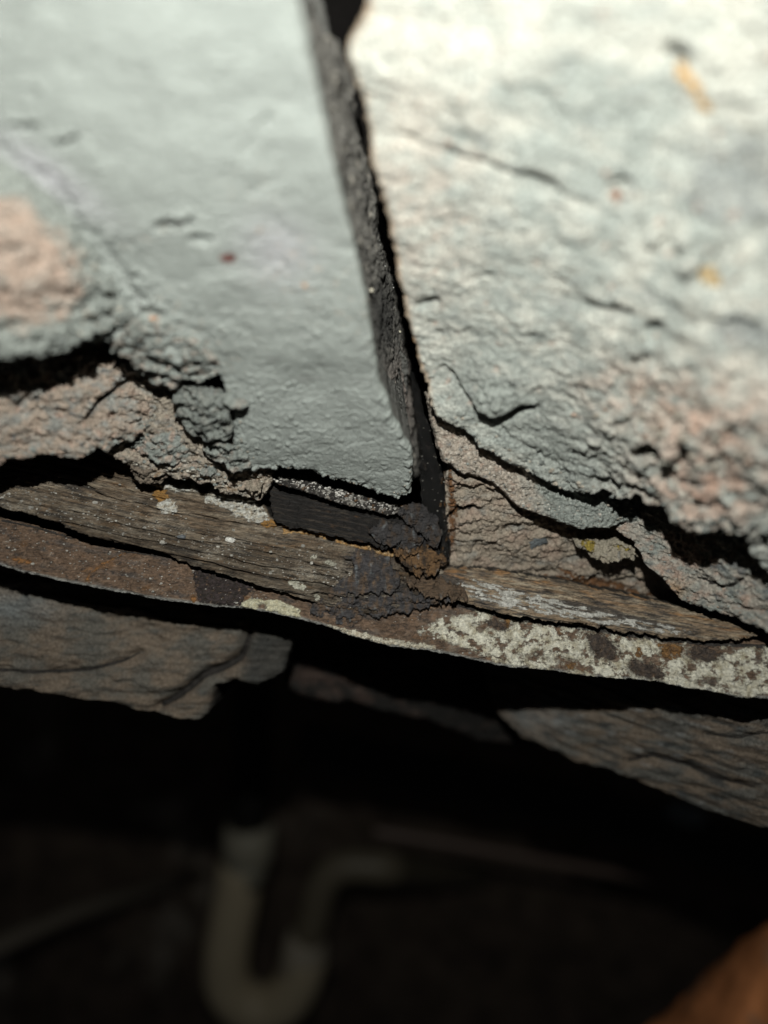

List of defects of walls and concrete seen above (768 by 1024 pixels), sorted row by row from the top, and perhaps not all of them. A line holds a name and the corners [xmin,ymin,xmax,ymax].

spalling [0,317,276,501]
corrosion [447,468,458,546]
spalling [424,391,768,632]
leakage [327,579,768,698]
corrosion [544,567,653,596]